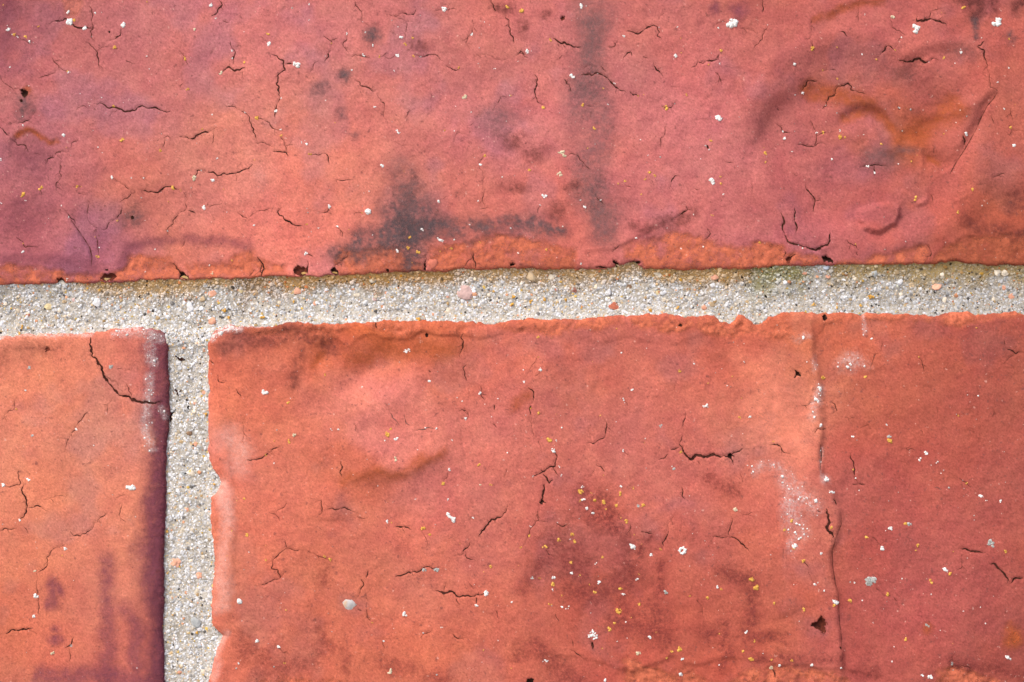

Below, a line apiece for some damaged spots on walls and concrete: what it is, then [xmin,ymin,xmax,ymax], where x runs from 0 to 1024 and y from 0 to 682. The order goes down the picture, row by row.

crack [555,13,722,117]
crack [878,8,946,63]
crack [0,0,541,279]
water stain [335,215,565,272]
crack [781,174,858,255]
crack [65,337,160,447]
crack [0,474,69,531]
crack [526,362,565,555]
crack [661,413,743,482]
crack [819,455,865,540]
crack [6,495,124,634]
crack [395,505,508,618]